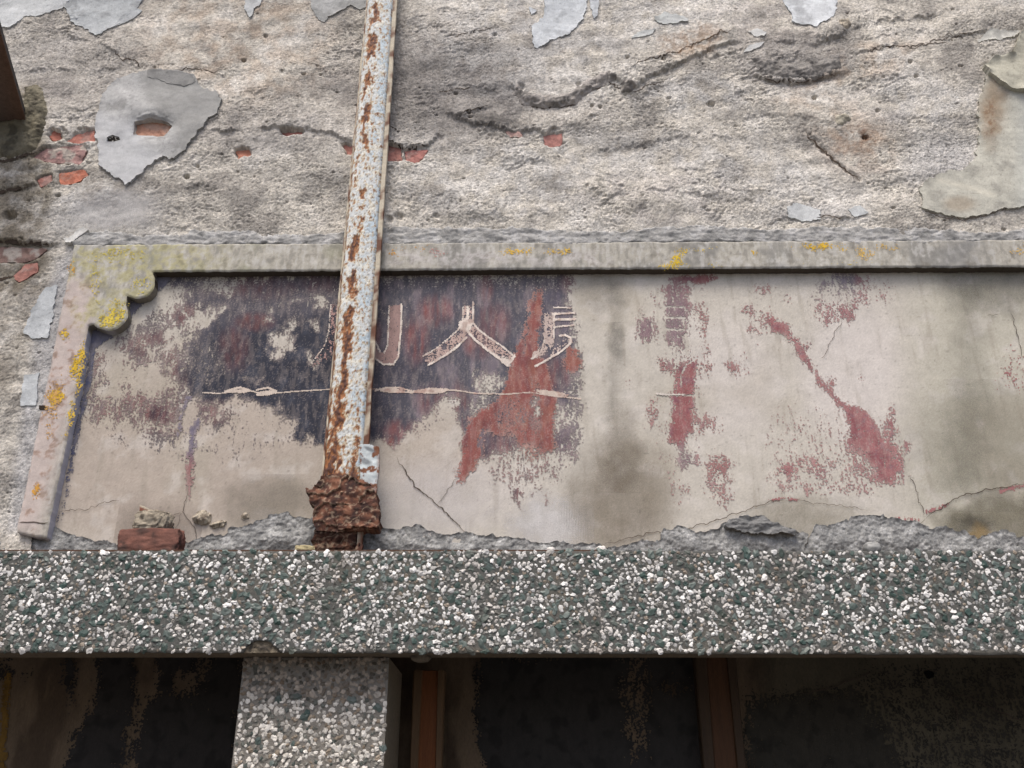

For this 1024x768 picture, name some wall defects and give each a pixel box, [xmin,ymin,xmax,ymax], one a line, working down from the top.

peeling [529,0,599,49]
peeling [783,0,838,27]
crack [597,28,733,92]
spalling [34,68,223,188]
peeling [919,28,1024,219]
flaking render [388,146,428,163]
crack [806,132,859,180]
peeling [63,227,90,246]
crack [397,458,465,532]
spalling [0,241,1024,768]
crack [909,475,1024,523]